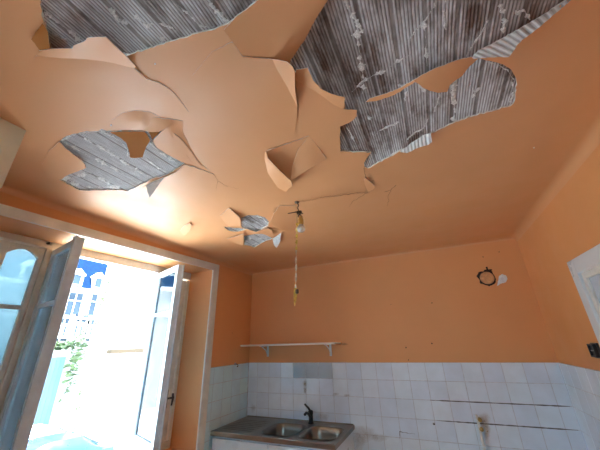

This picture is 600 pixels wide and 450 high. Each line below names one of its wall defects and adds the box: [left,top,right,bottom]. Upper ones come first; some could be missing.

peeling [22,0,570,198]
peeling [220,206,297,248]